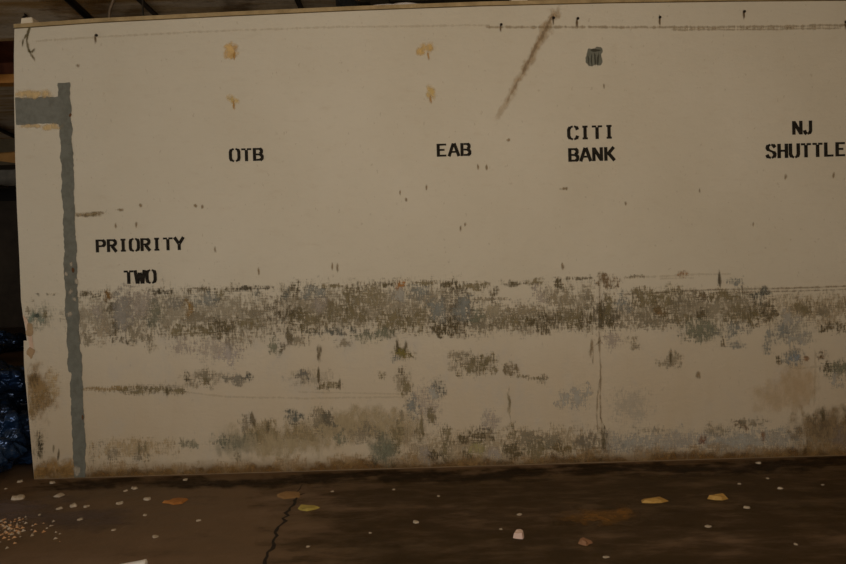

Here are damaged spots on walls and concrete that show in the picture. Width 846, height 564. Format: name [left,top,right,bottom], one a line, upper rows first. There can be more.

peeling [15,82,846,478]
crack [263,484,305,564]